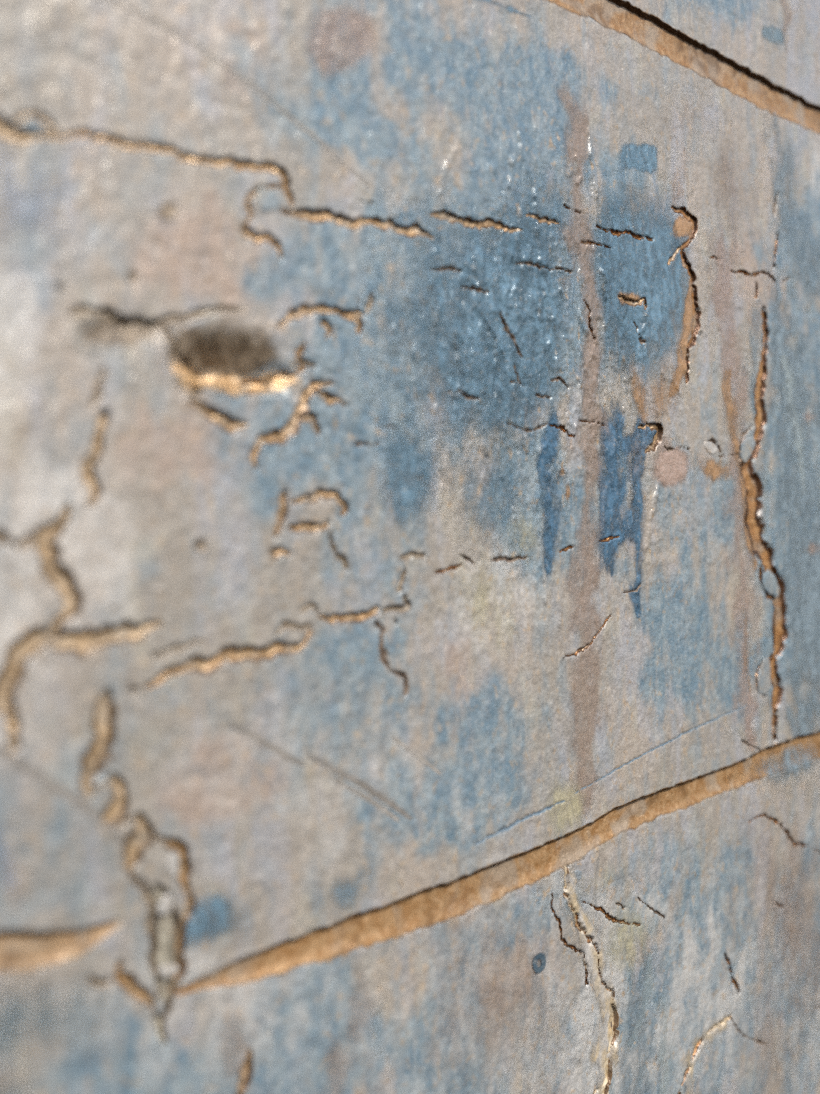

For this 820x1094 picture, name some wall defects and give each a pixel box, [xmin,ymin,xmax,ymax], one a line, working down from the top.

crack [0,111,789,750]
crack [0,370,527,1046]
crack [749,813,820,852]
crack [237,1050,253,1094]
crack [551,865,665,1094]